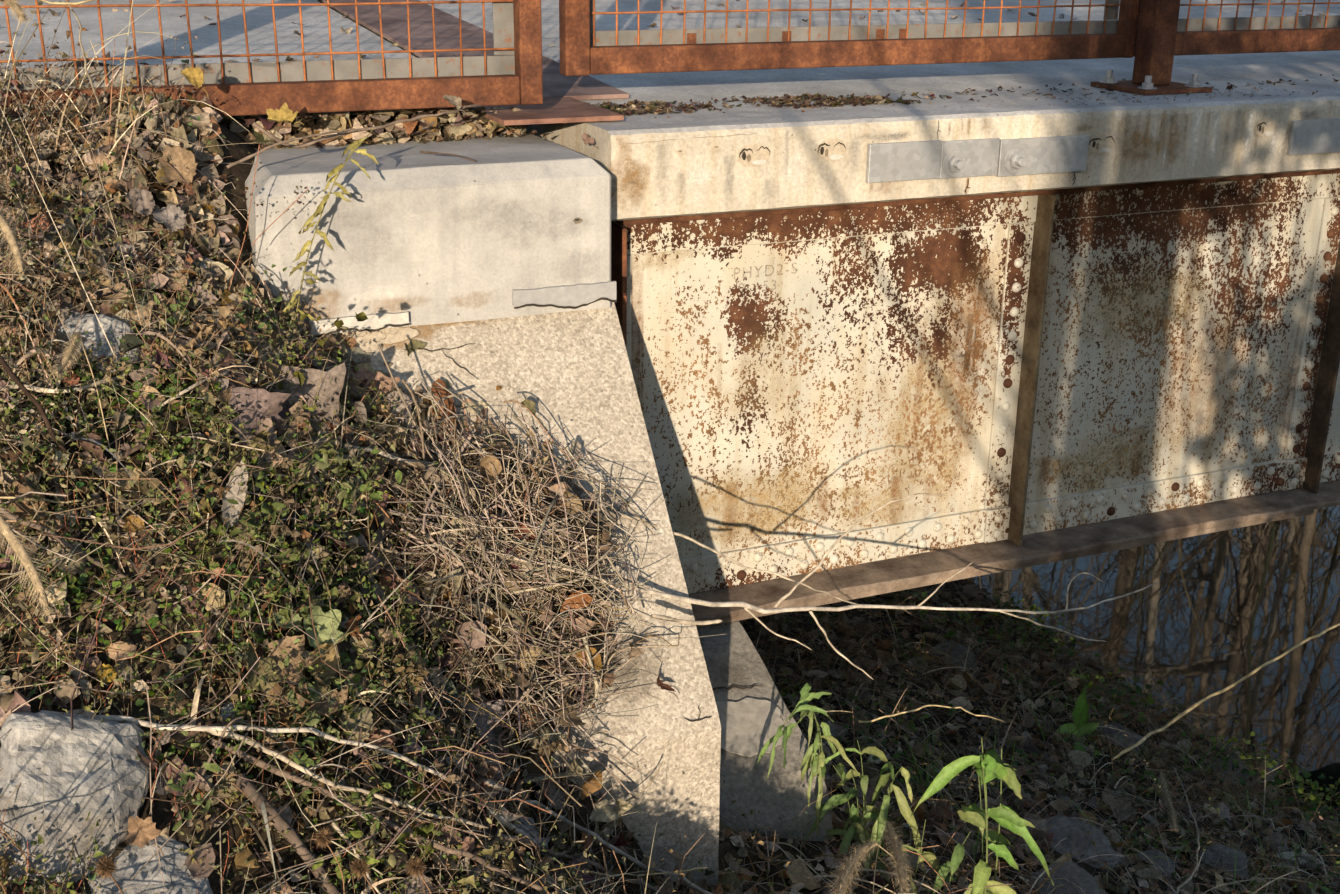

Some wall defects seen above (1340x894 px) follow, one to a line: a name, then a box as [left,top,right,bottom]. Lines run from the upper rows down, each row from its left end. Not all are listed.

rust [699,481,800,533]